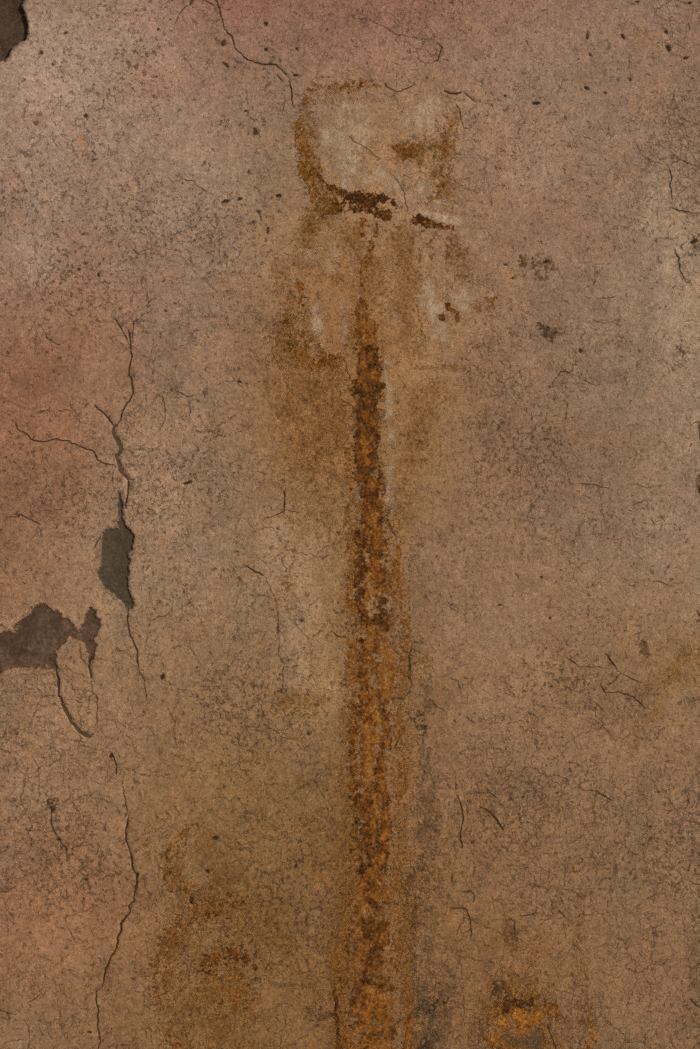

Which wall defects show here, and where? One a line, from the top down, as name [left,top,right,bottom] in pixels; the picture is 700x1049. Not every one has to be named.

spalling [0,0,28,61]
crack [175,0,293,105]
corrosion [391,116,454,264]
corrosion [278,278,343,372]
corrosion [439,302,460,322]
crack [16,312,149,508]
spalling [98,492,134,610]
corrosion [295,79,428,1049]
spalling [0,603,101,673]
crack [127,609,147,697]
crack [56,648,138,1049]
corrosion [477,981,560,1049]